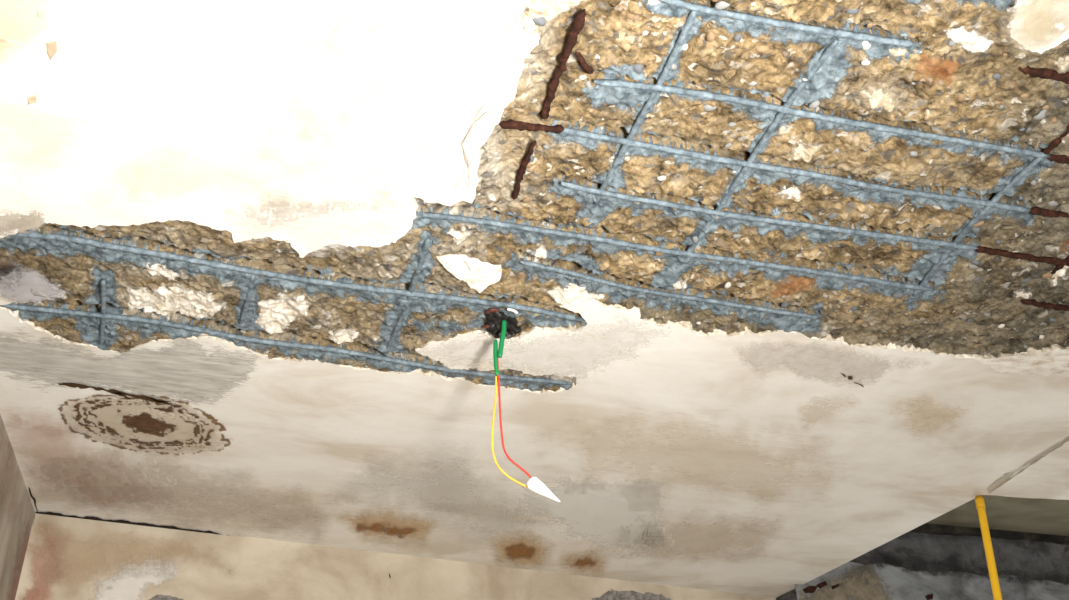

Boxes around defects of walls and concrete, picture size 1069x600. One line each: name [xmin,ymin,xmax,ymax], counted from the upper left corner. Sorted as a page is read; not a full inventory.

rust [499,119,564,134]
rust [1042,124,1069,164]
spalling [0,0,1069,405]
rust [1030,206,1069,218]
rust [975,246,1069,267]
damp [58,394,231,455]
rust [348,515,431,538]
rust [496,537,545,563]